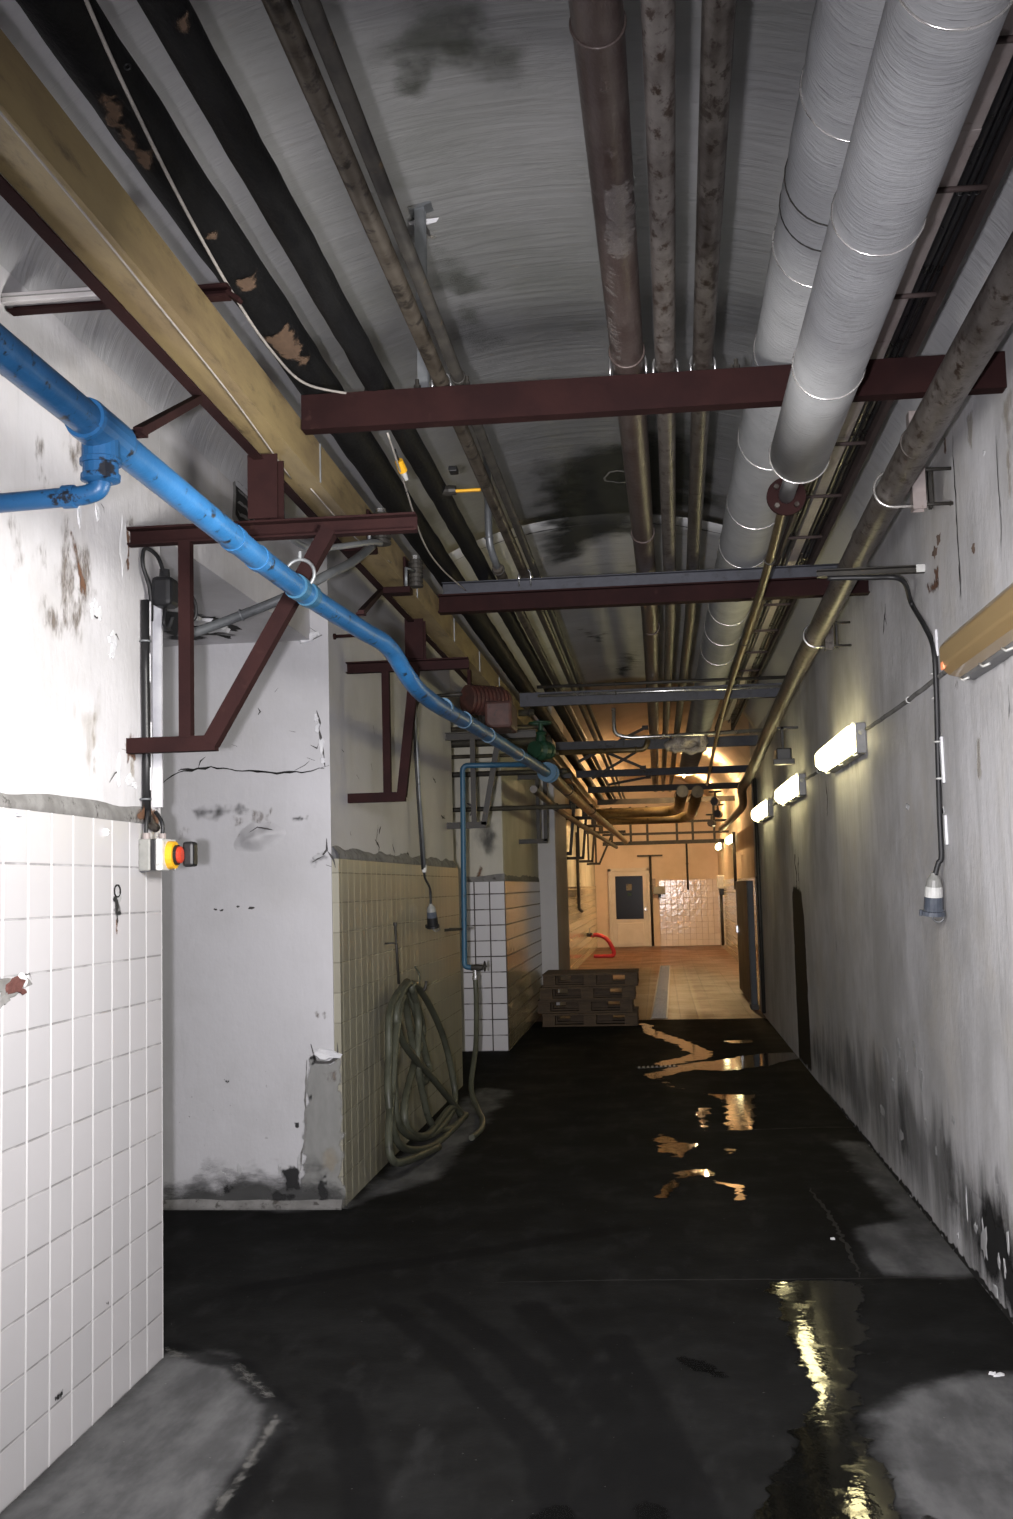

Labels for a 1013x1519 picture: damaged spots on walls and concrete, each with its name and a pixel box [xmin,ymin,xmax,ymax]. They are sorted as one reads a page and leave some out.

crack [163,757,329,783]
flaking render [299,1044,346,1201]
leakage [164,1156,347,1209]